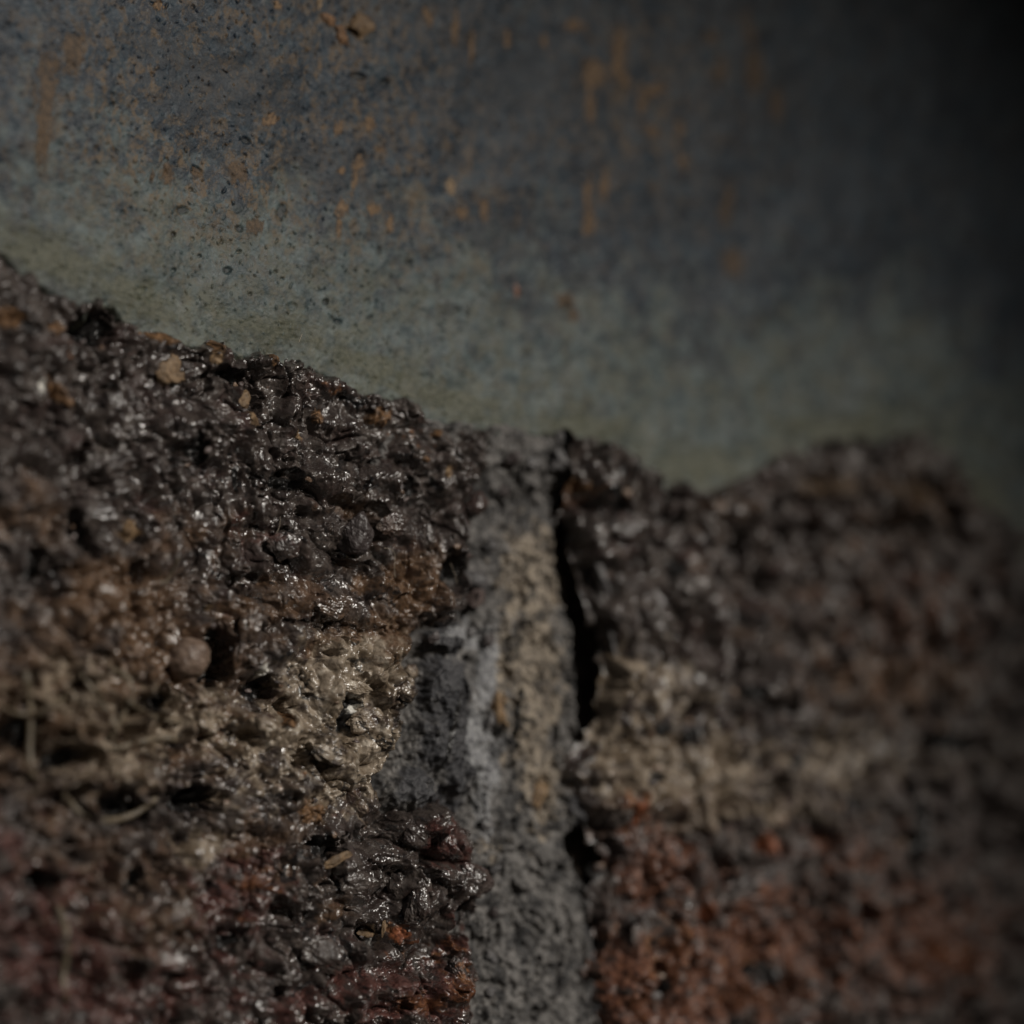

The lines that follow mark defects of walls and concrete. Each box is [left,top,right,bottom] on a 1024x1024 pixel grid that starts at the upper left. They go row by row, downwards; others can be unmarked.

crack [550,506,603,746]
crack [563,814,618,1016]